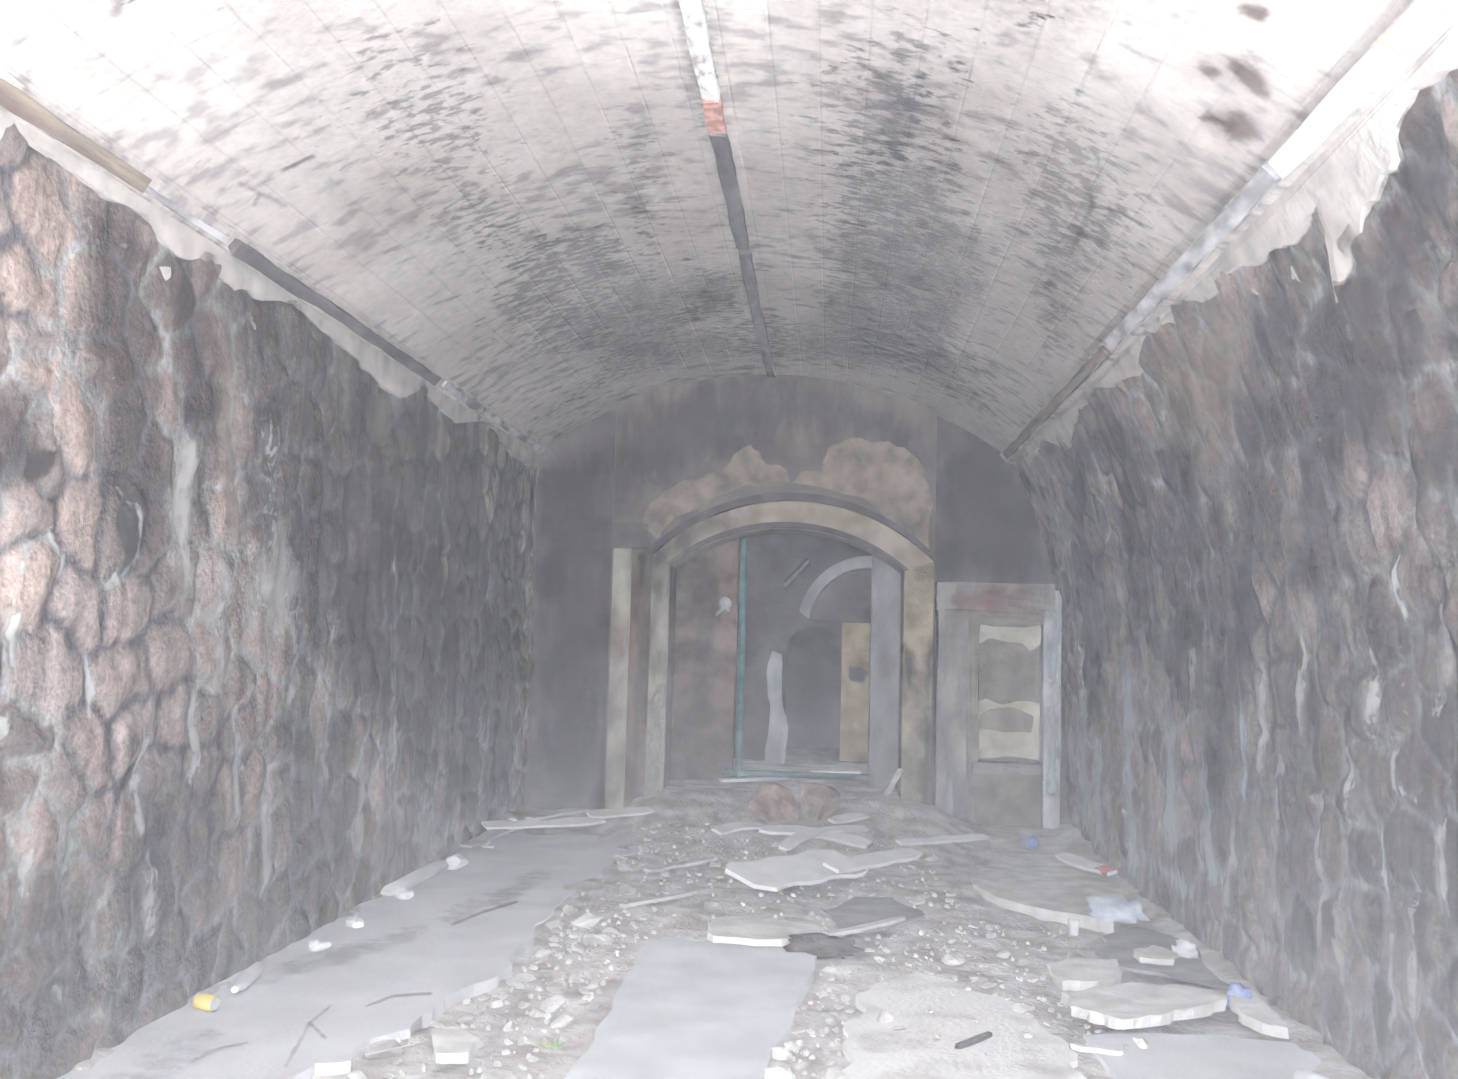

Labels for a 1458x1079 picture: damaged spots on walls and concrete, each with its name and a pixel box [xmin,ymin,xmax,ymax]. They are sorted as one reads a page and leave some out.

spalling [23,451,57,479]
spalling [117,503,138,571]
damp [92,209,215,584]
peeling [0,106,536,470]
damp [476,197,742,359]
peeling [642,438,933,549]
damp [795,31,1004,371]
peeling [1026,18,1458,458]